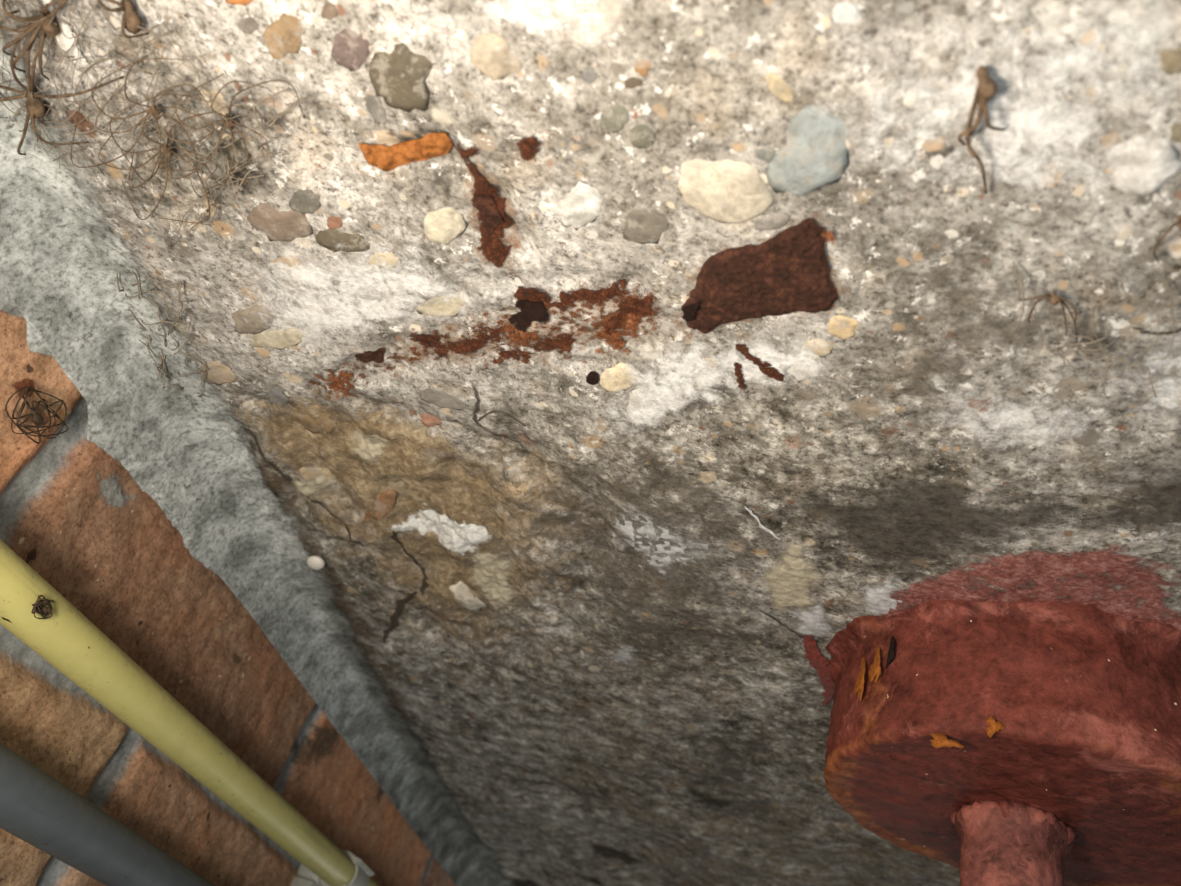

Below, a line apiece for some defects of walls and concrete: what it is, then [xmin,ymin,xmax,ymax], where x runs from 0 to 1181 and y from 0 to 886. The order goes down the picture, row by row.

corrosion [450,139,517,269]
corrosion [516,137,541,162]
corrosion [307,218,840,402]
spalling [12,378,34,397]
spalling [232,400,517,643]